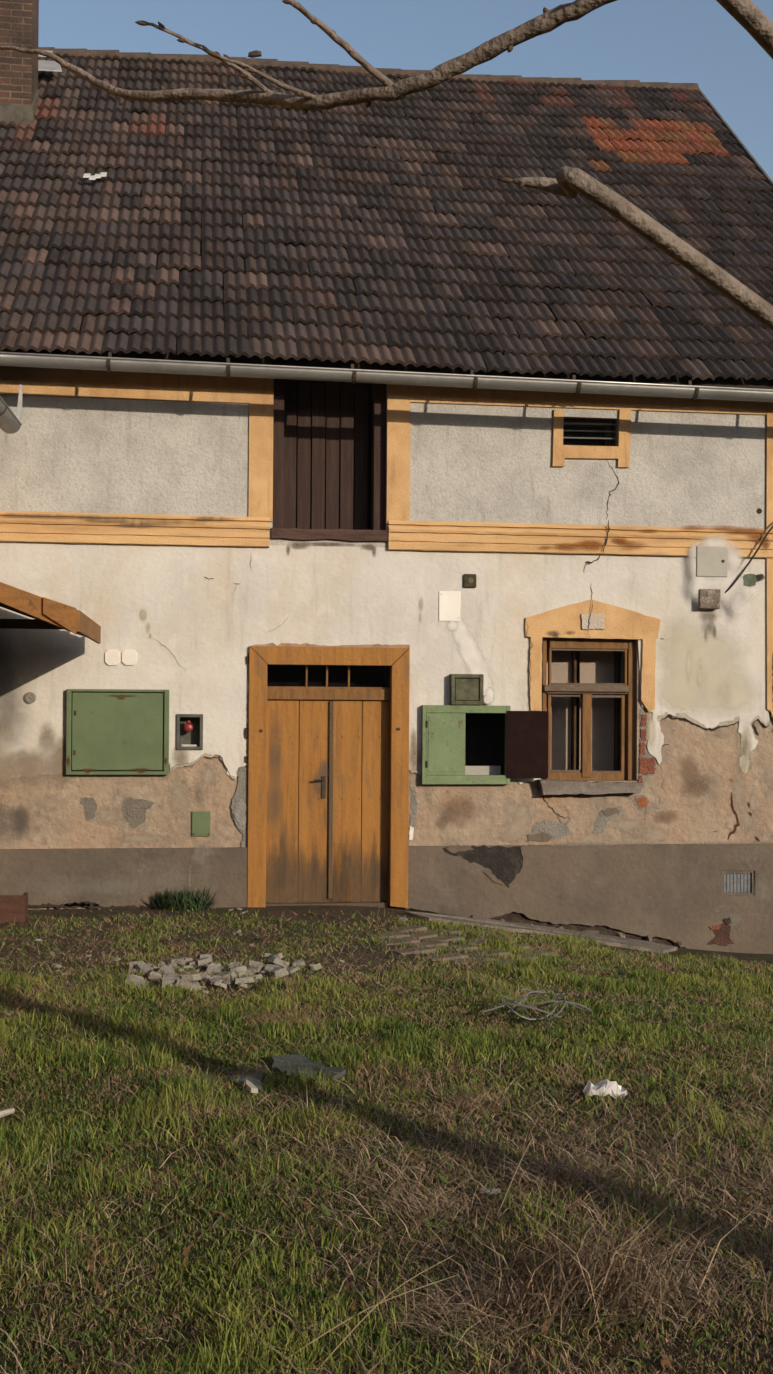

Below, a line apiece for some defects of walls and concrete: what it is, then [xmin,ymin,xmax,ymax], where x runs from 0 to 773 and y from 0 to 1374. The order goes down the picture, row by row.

crack [584,462,619,639]
flaking render [244,643,410,763]
flaking render [0,753,247,849]
flaking render [408,708,773,866]